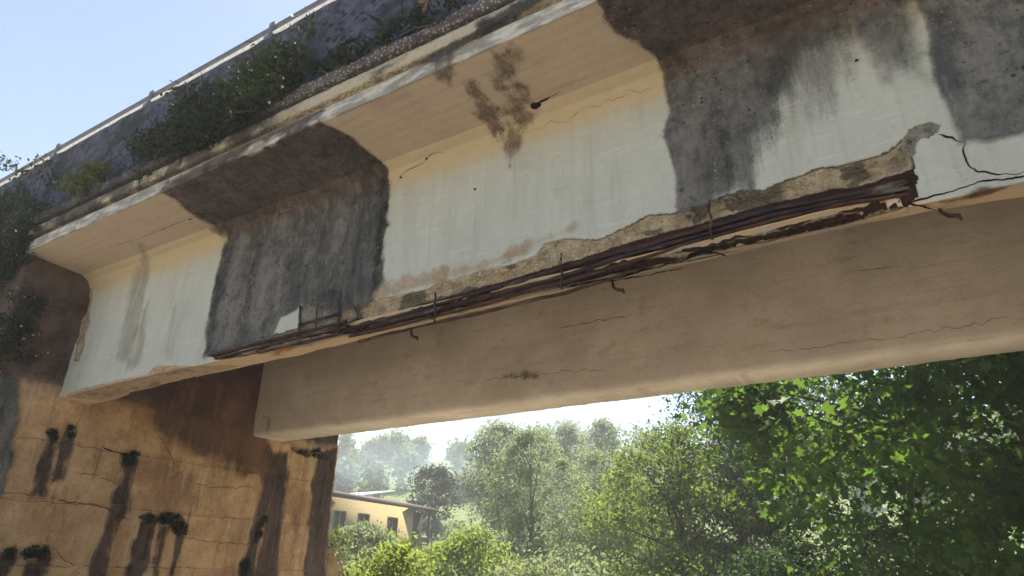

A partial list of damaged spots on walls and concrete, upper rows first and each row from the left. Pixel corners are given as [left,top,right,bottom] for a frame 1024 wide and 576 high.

crack [520,88,649,135]
damp [599,0,1024,214]
damp [161,109,389,356]
spalling [67,122,941,400]
spalling [937,208,963,220]
crack [906,134,1024,210]
damp [30,430,76,499]
crack [3,472,133,523]
damp [88,460,138,576]
damp [124,521,184,576]
damp [154,369,289,576]
damp [304,447,337,576]